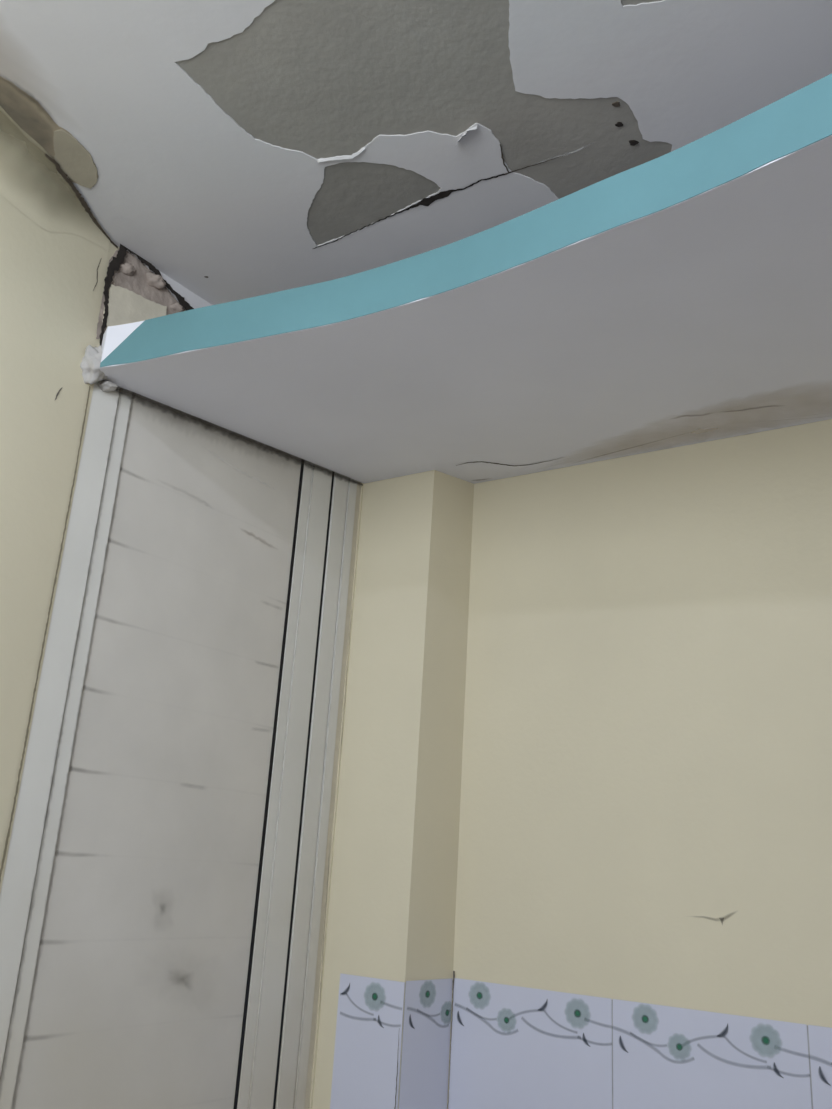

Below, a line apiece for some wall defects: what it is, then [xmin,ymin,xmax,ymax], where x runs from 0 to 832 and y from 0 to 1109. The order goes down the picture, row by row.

peeling [176,0,672,245]
crack [45,154,118,291]
crack [313,144,562,249]
crack [456,457,564,466]